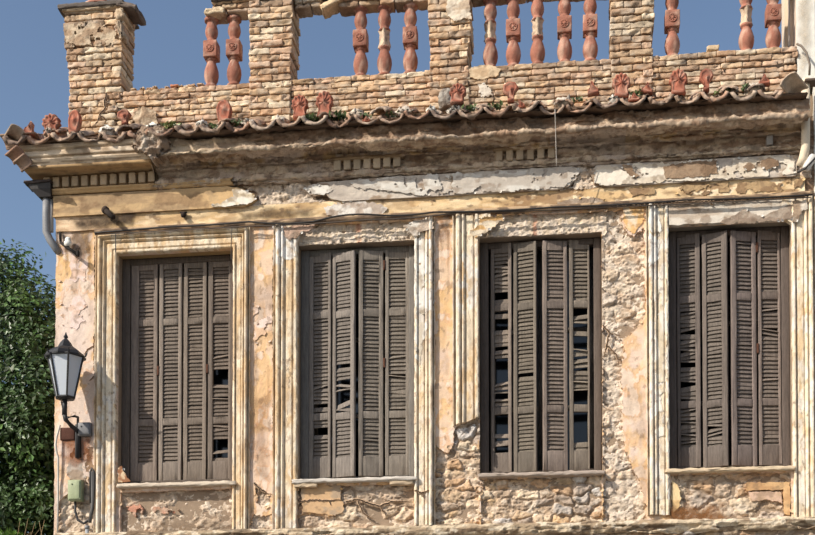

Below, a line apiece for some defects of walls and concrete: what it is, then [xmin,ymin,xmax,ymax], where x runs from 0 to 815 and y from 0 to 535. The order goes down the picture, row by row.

damp [448,120,540,130]
flaking render [211,181,435,363]
flaking render [350,152,812,525]
crack [602,325,620,366]
peeling [117,466,131,483]
flaking render [118,489,232,532]
flaking render [250,488,272,529]
flaking render [297,484,415,528]
crack [298,489,434,535]